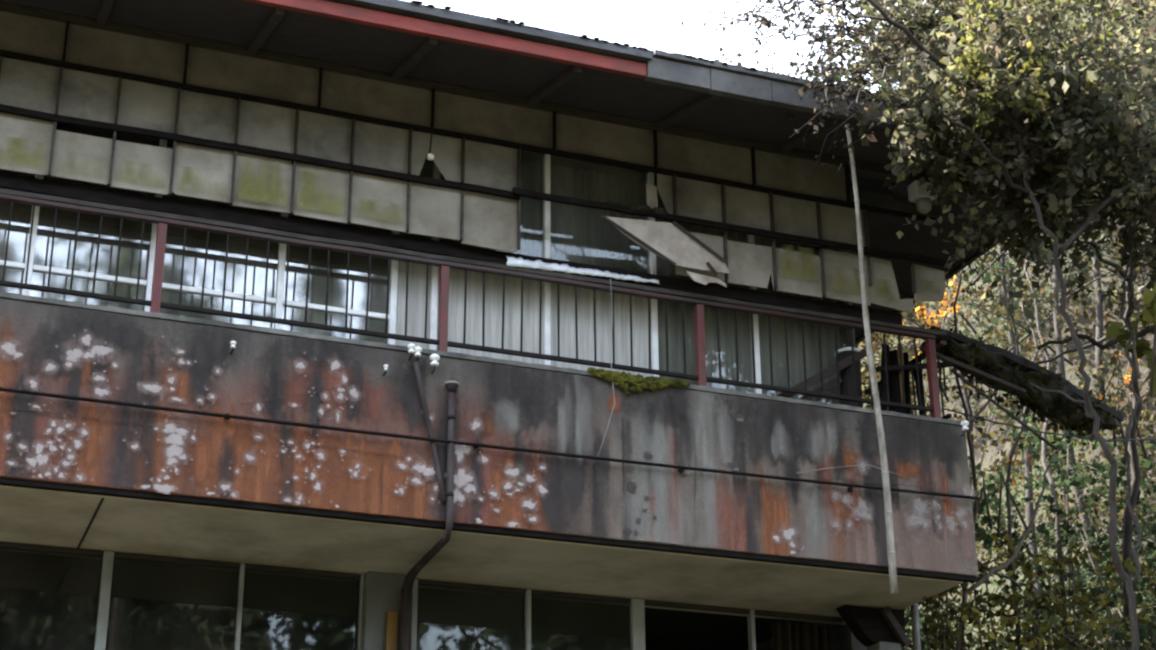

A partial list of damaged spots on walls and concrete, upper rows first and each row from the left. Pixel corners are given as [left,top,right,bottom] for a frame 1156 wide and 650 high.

peeling [4,402,101,481]
peeling [29,329,118,398]
rust [67,360,111,486]
rust [137,410,181,494]
peeling [135,414,196,494]
peeling [206,352,371,505]
rust [194,409,425,519]
leakage [471,439,482,524]
leakage [486,363,607,537]
leakage [622,388,713,543]
leakage [720,396,844,552]
rust [760,441,972,573]